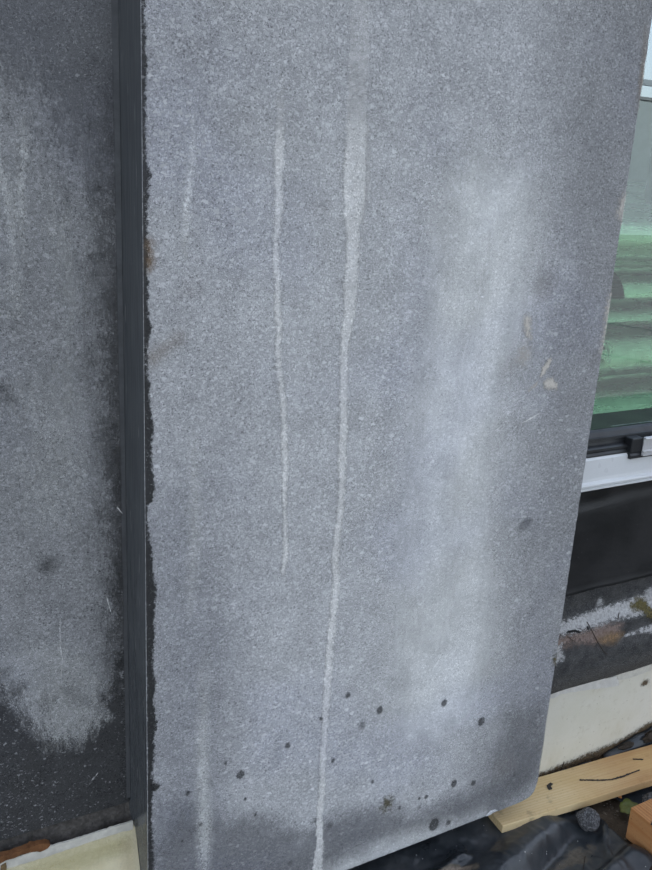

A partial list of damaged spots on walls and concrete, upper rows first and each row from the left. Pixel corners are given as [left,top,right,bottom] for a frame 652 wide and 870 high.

water stain [0,61,128,841]
water stain [141,0,537,870]